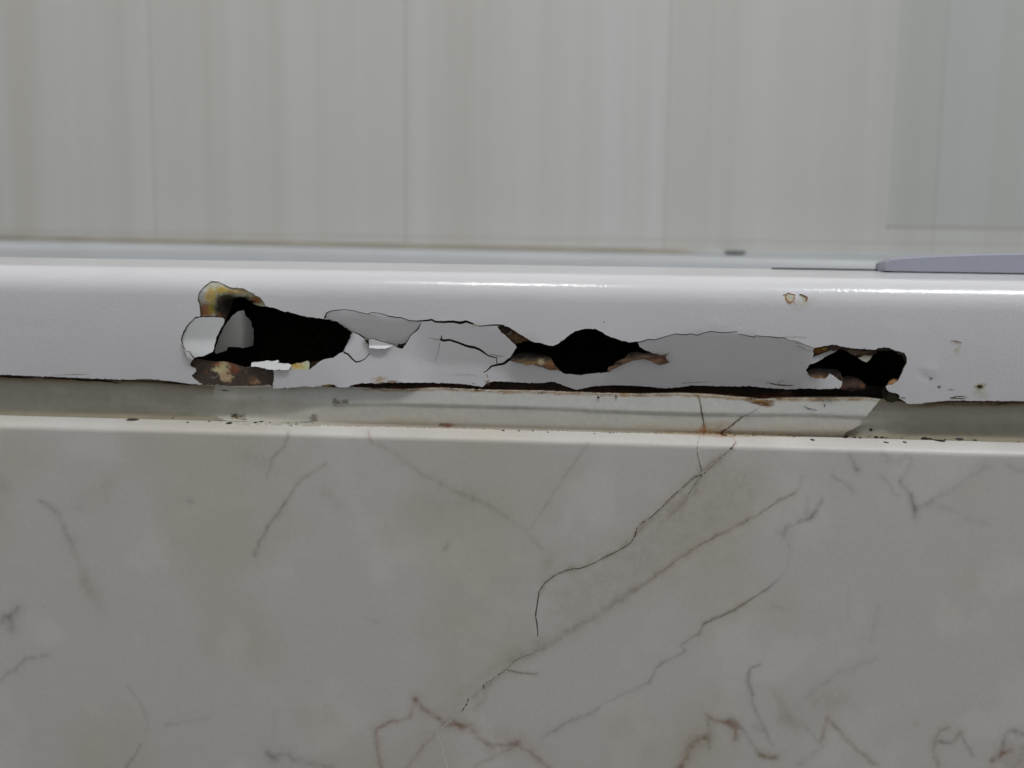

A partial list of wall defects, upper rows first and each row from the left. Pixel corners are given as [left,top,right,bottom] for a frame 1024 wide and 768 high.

corrosion [199,282,266,320]
peeling [784,292,808,304]
peeling [182,310,254,360]
corrosion [137,358,274,386]
peeling [251,360,292,370]
corrosion [351,325,909,406]
peeling [811,350,837,364]
crack [436,382,757,768]